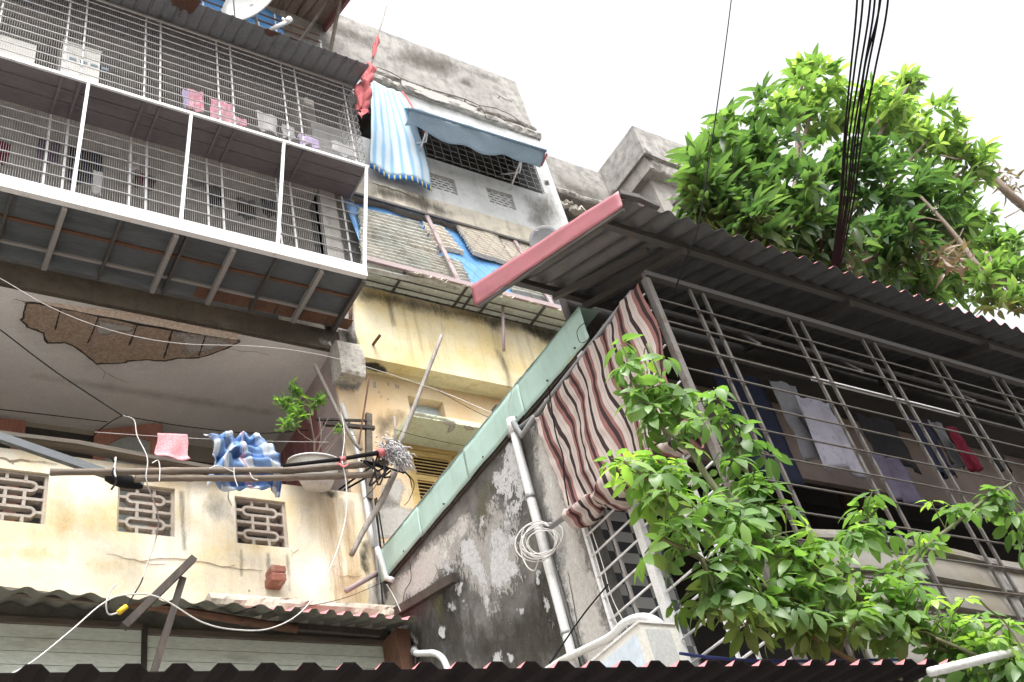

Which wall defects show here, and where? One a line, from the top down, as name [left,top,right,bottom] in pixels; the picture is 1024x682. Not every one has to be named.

leakage [403,52,451,70]
flaking render [20,301,240,365]
peeling [438,443,526,612]